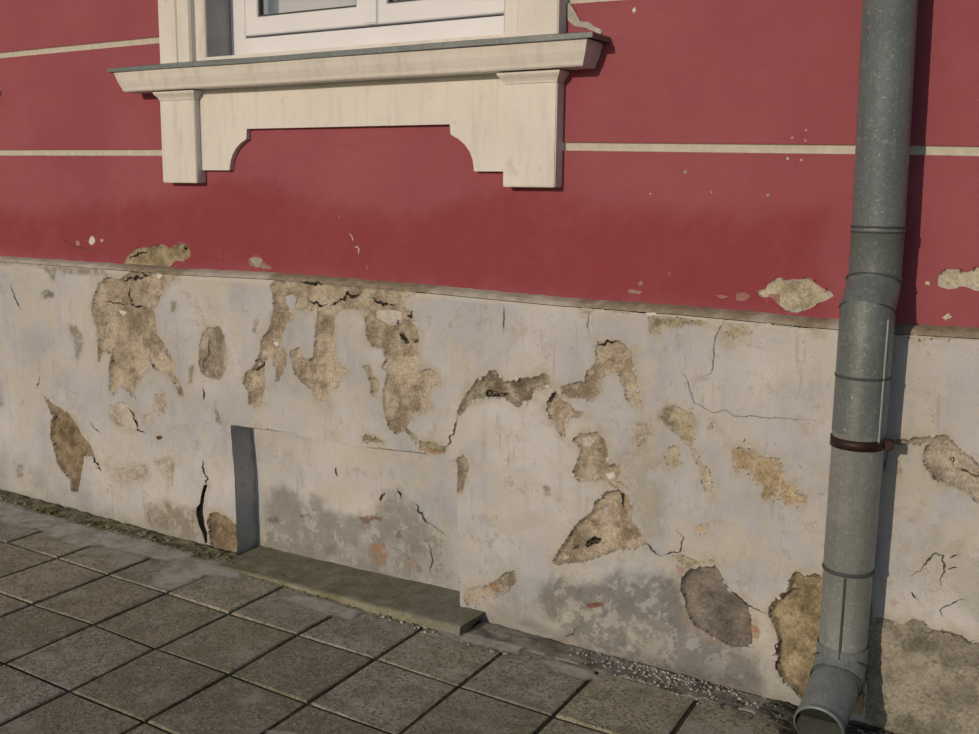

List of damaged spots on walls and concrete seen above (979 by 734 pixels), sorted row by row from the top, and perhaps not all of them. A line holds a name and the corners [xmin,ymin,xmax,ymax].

flaking render [91,242,190,432]
flaking render [243,280,446,454]
crack [684,324,799,420]
peeling [717,278,833,313]
peeling [925,268,979,291]
flaking render [45,397,175,492]
flaking render [456,339,647,566]
crack [196,460,209,543]
flaking render [671,554,759,648]
flaking render [768,571,823,699]
flaking render [851,617,979,734]
crack [911,552,964,615]